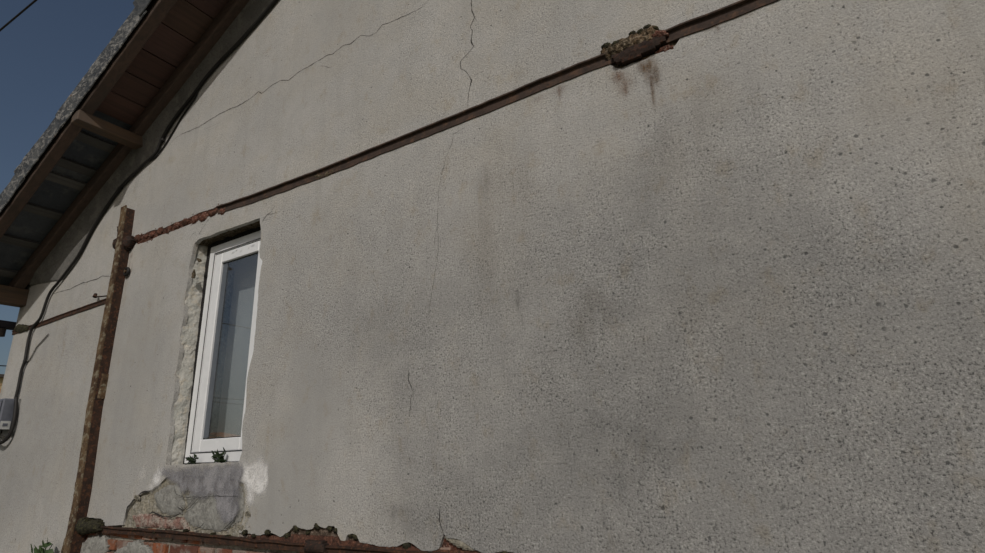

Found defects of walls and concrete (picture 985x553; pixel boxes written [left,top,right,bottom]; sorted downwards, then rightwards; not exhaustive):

crack [460,0,475,106]
spalling [600,24,677,69]
spalling [122,475,251,537]
spalling [275,523,359,541]